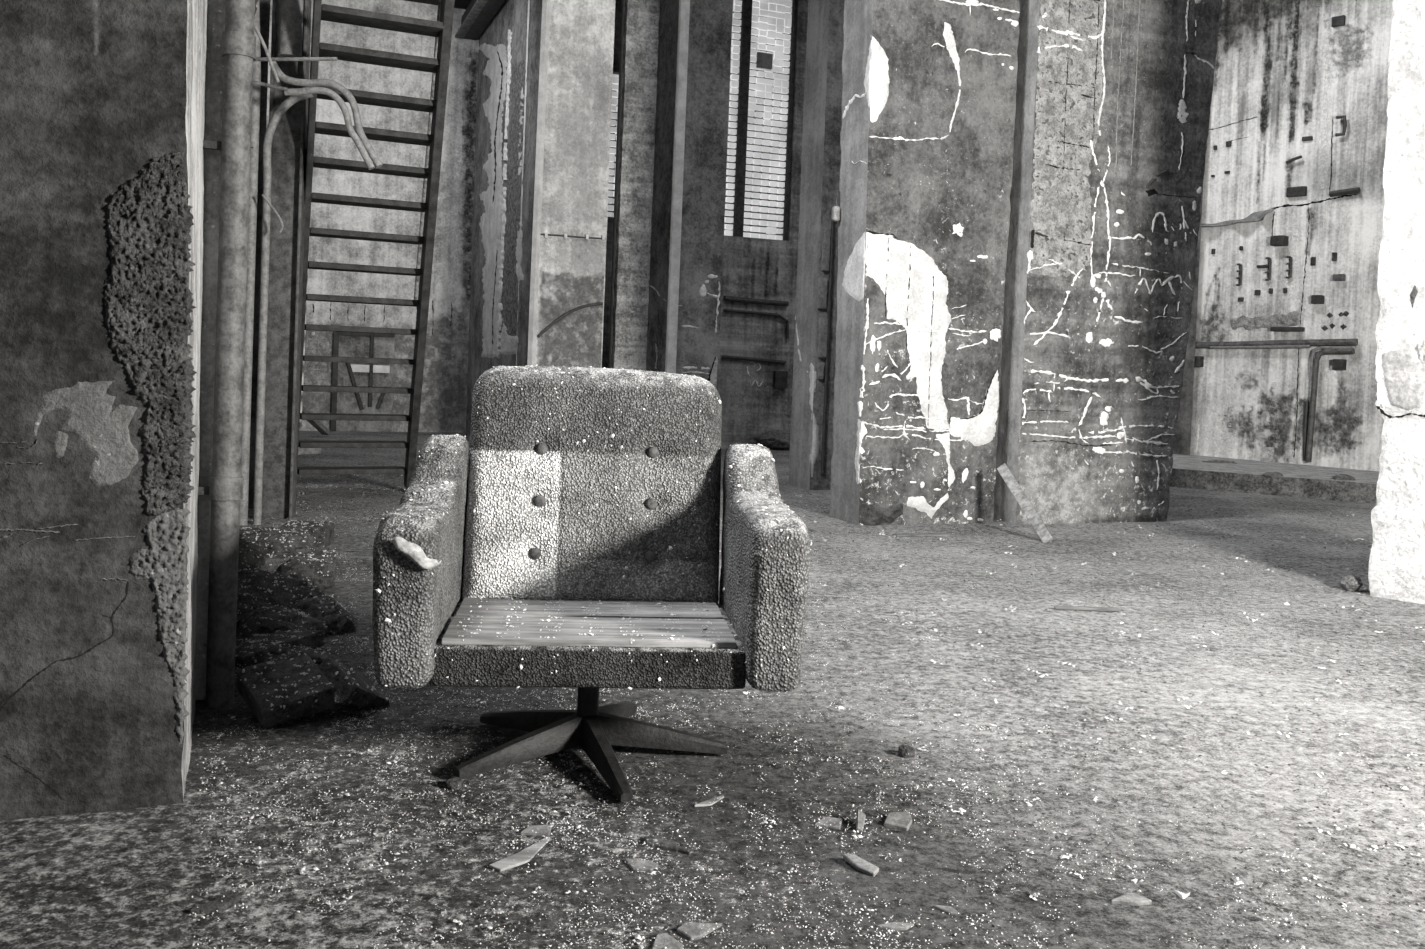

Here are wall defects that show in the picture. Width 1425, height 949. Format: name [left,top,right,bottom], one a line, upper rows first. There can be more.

flaking render [843,36,890,123]
spalling [940,0,1020,27]
leakage [1214,0,1331,190]
leakage [383,53,478,428]
spalling [1022,0,1187,510]
leakage [1284,223,1300,303]
spalling [0,152,197,745]
leakage [303,304,366,423]
flaking render [842,231,1001,518]
crack [1030,410,1111,446]
leakage [1225,349,1362,461]
flaking render [1369,352,1425,601]